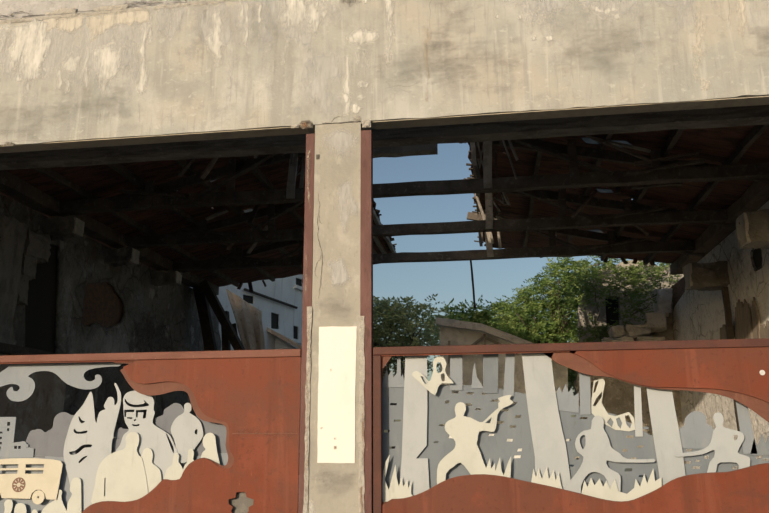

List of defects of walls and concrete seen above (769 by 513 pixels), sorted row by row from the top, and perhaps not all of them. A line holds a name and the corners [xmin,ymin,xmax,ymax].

leakage [0,0,186,94]
crack [315,195,323,298]